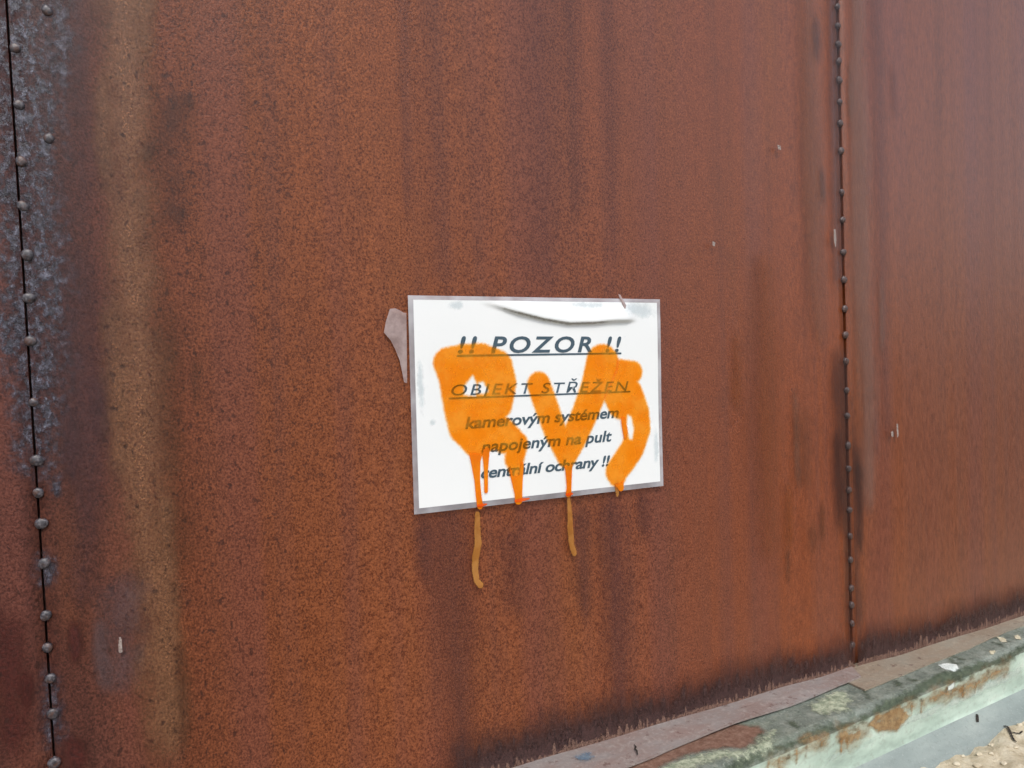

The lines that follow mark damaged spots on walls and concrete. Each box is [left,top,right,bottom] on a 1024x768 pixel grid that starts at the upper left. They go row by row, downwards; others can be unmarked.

rust [0,0,75,496]
water stain [456,593,1024,768]